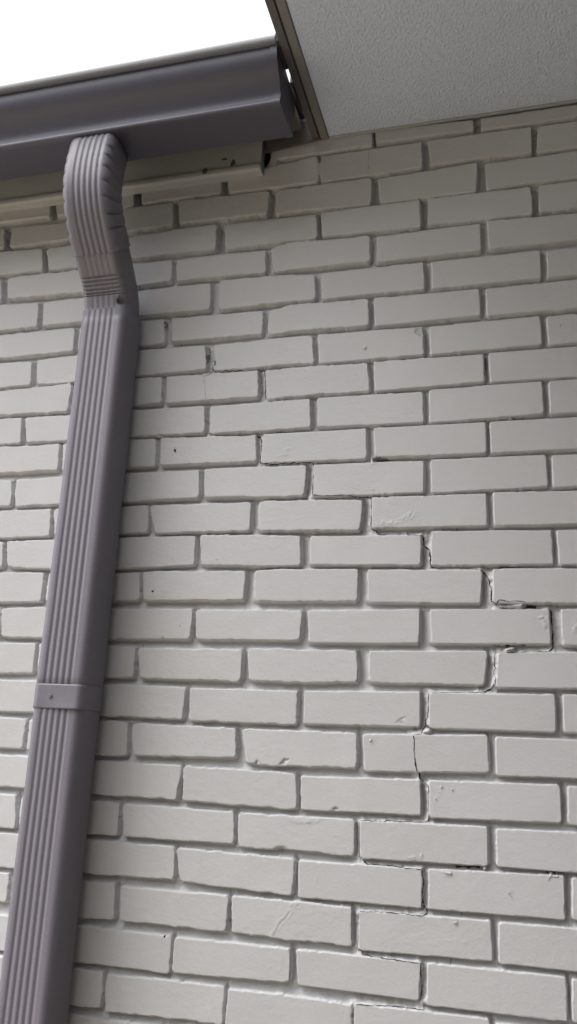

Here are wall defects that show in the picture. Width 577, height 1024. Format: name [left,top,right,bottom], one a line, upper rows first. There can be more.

crack [204,370,266,435]
crack [256,435,438,569]
crack [354,568,554,1010]